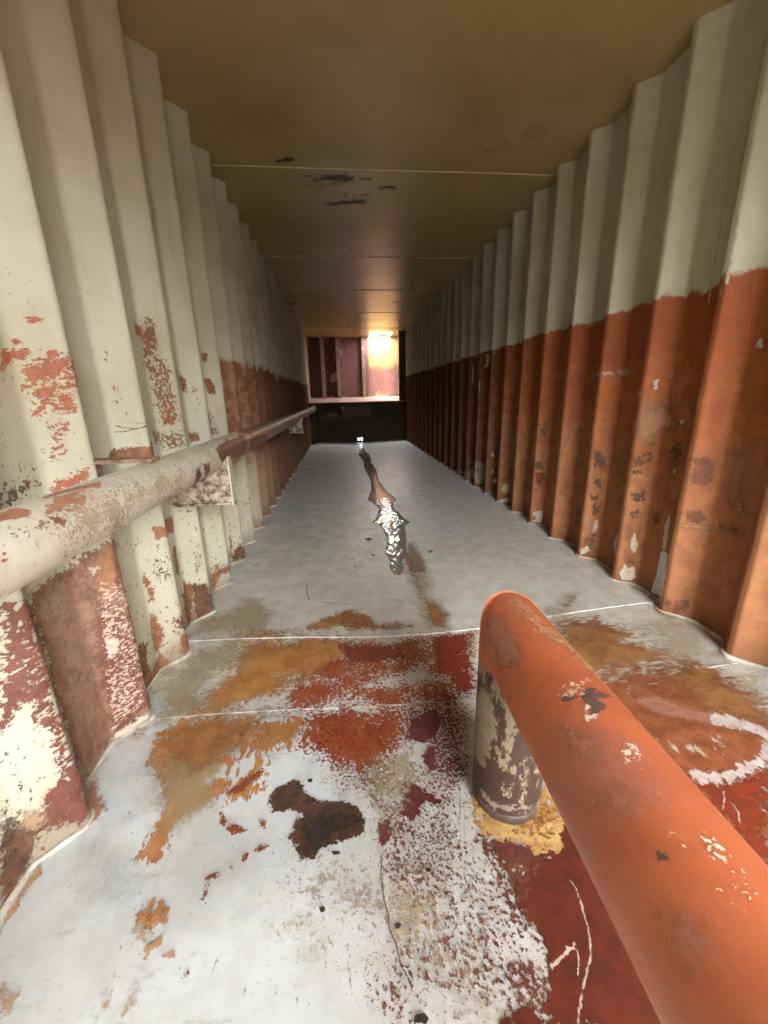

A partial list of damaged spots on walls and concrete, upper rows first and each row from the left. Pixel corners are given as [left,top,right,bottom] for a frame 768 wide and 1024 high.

peeling [108,312,220,458]
peeling [0,338,102,538]
peeling [580,516,598,555]
peeling [619,533,638,581]
peeling [651,515,671,601]
rust [184,581,196,625]
peeling [0,516,246,909]
rust [130,610,479,866]
rust [547,596,768,866]
rust [87,777,109,825]
rust [0,866,42,934]
rust [199,843,269,905]